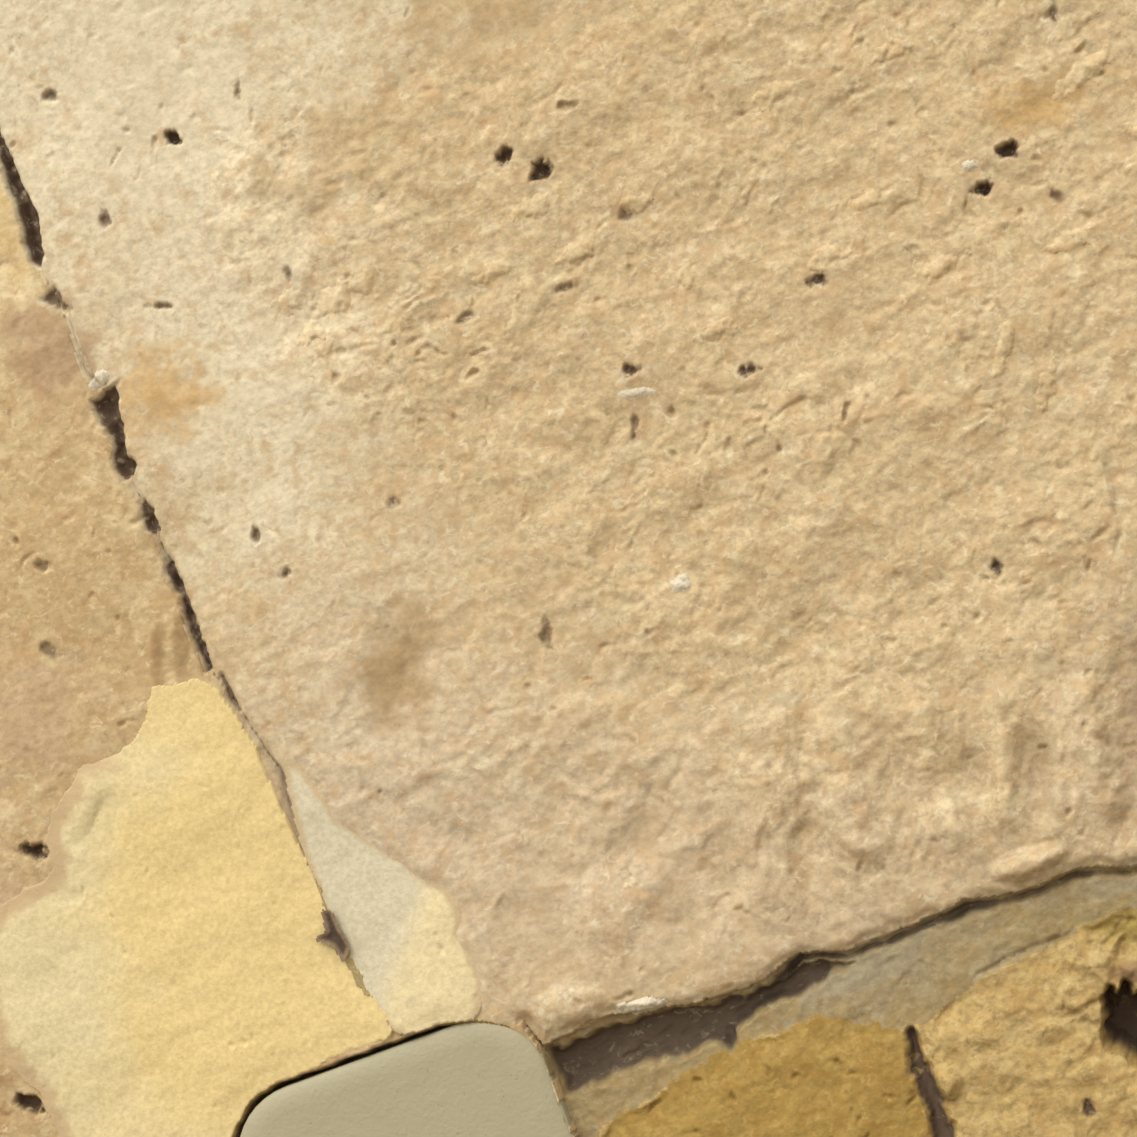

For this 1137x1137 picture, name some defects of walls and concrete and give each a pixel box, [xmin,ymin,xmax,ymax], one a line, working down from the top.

crack [0,126,302,847]
crack [540,866,1137,1097]